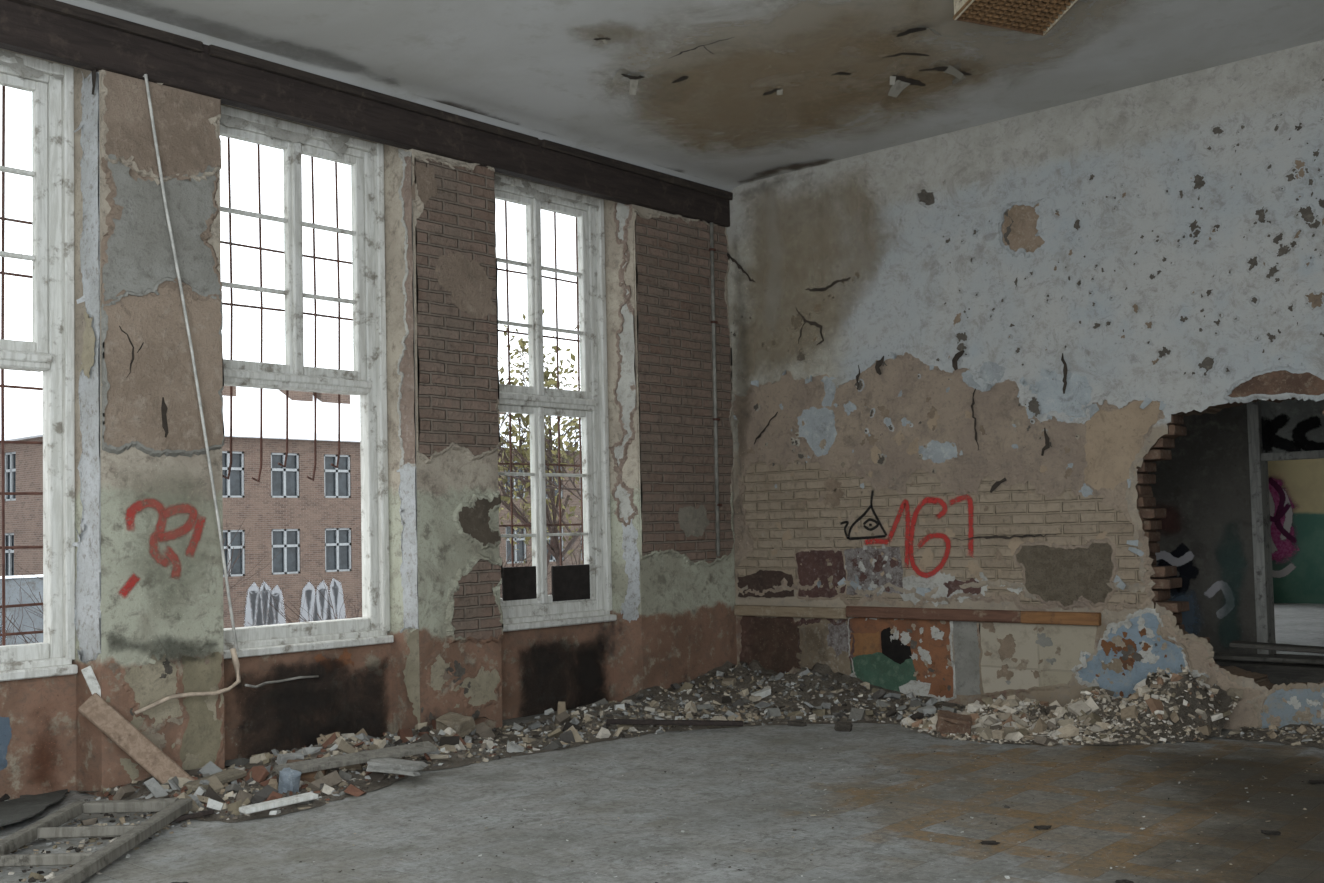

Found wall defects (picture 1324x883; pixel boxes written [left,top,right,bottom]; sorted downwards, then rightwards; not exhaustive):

flaking render [0,49,65,80]
peeling [612,68,644,95]
damp [629,0,1121,149]
crack [796,277,851,345]
flaking render [72,70,377,770]
flaking render [397,112,1324,730]